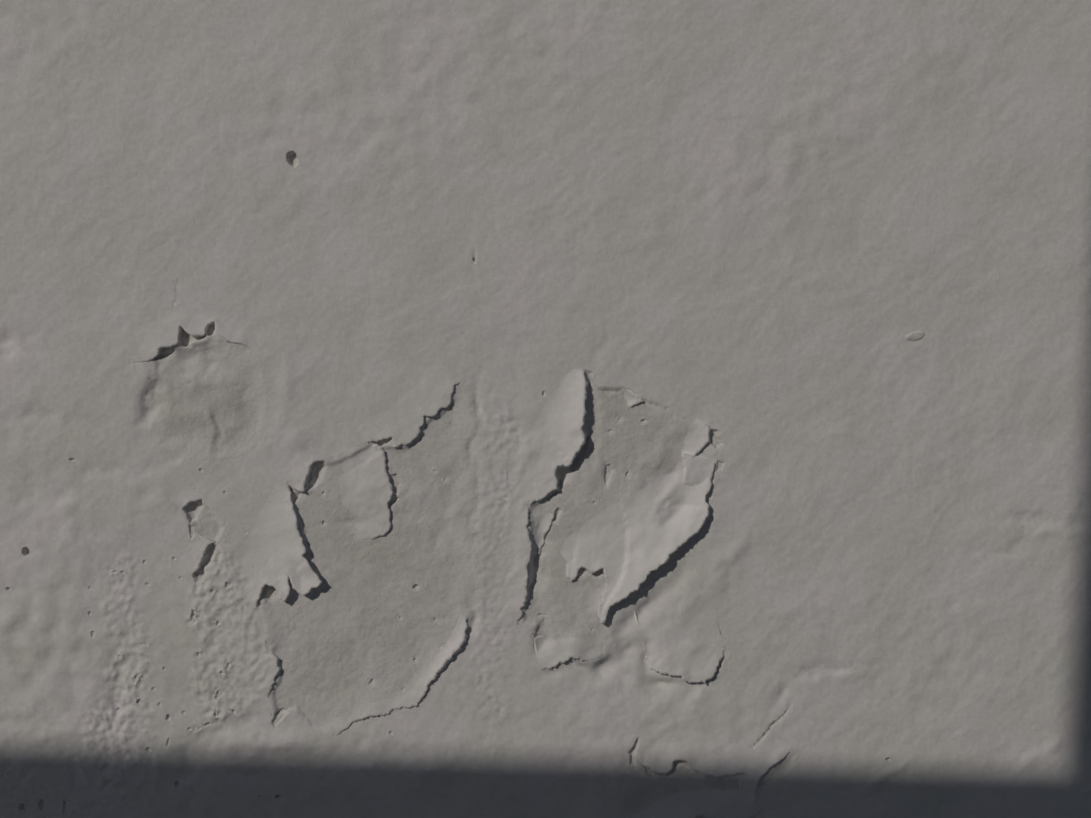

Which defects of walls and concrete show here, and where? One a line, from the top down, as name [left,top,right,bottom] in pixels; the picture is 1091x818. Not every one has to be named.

peeling [169,362,480,737]
peeling [493,367,728,684]
peeling [611,735,799,818]